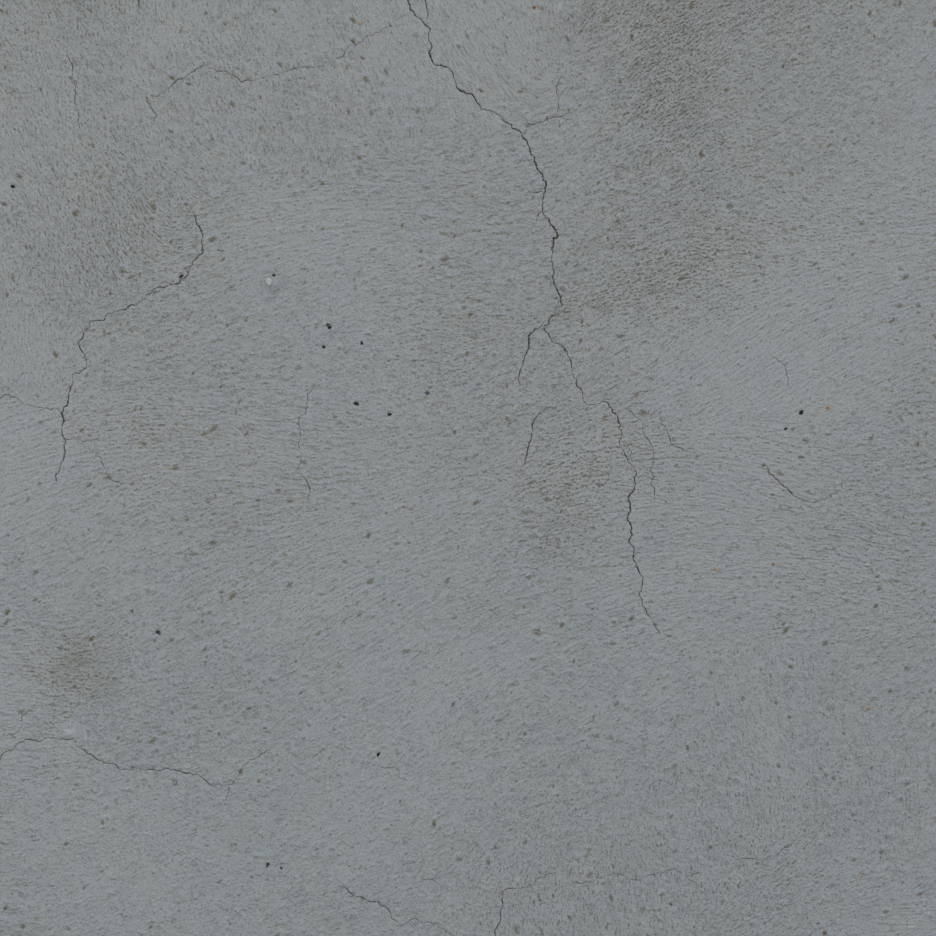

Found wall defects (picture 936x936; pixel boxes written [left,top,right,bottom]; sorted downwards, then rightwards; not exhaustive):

crack [0,212,204,484]
crack [147,0,689,635]